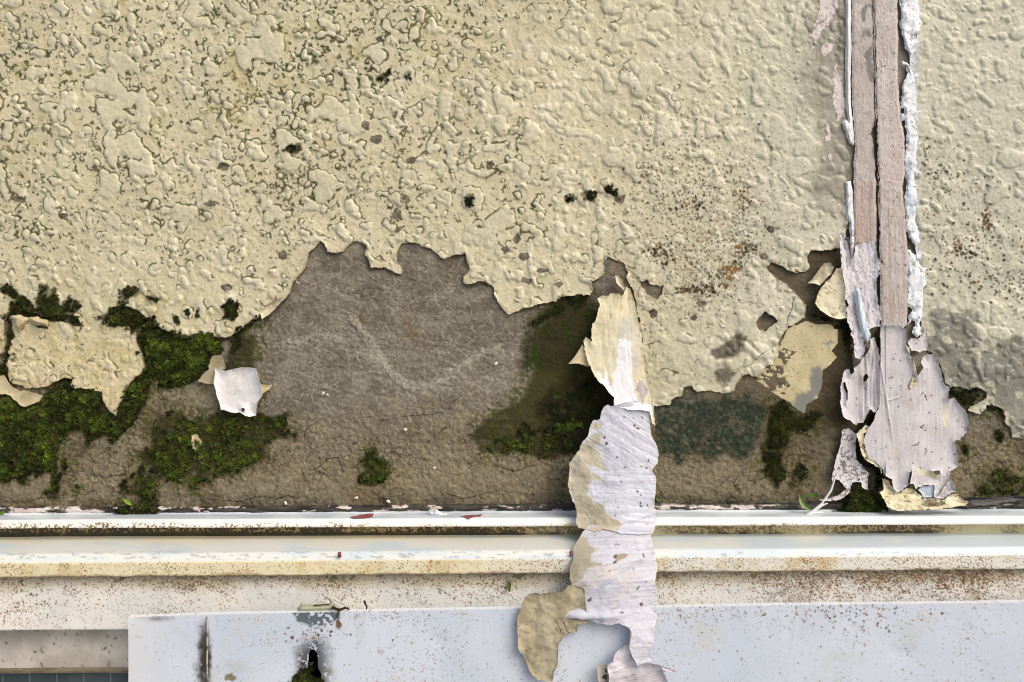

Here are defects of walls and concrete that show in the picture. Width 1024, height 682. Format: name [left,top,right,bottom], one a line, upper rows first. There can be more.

corrosion [583,132,773,338]
peeling [0,229,1024,682]
corrosion [768,570,1024,632]